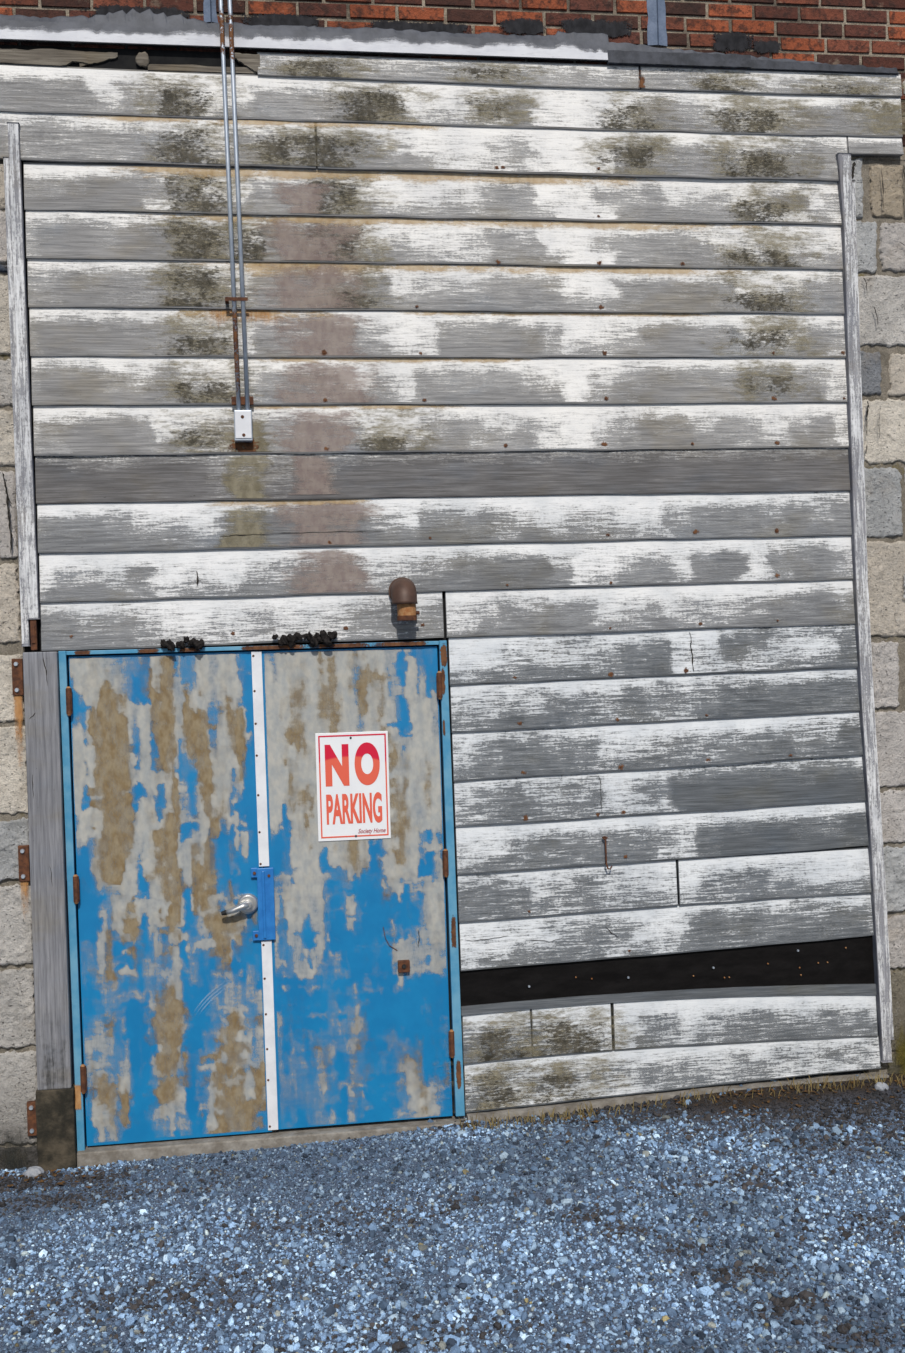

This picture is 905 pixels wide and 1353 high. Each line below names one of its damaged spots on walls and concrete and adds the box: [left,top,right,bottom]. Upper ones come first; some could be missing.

rust [216,183,374,594]
leakage [101,58,714,548]
leakage [696,71,905,400]
rust [14,695,23,738]
peeling [0,28,905,1110]
peeling [85,1013,130,1142]
peeling [133,991,188,1136]
leakage [464,1008,628,1111]